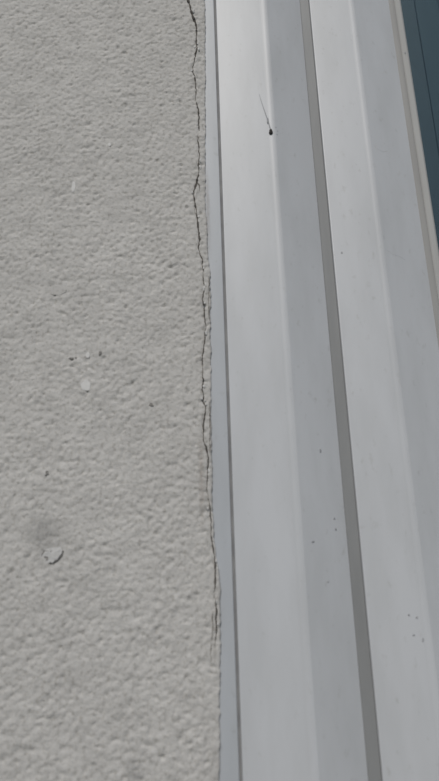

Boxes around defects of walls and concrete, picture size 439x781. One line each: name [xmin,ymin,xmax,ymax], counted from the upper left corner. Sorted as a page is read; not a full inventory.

crack [187,0,219,656]